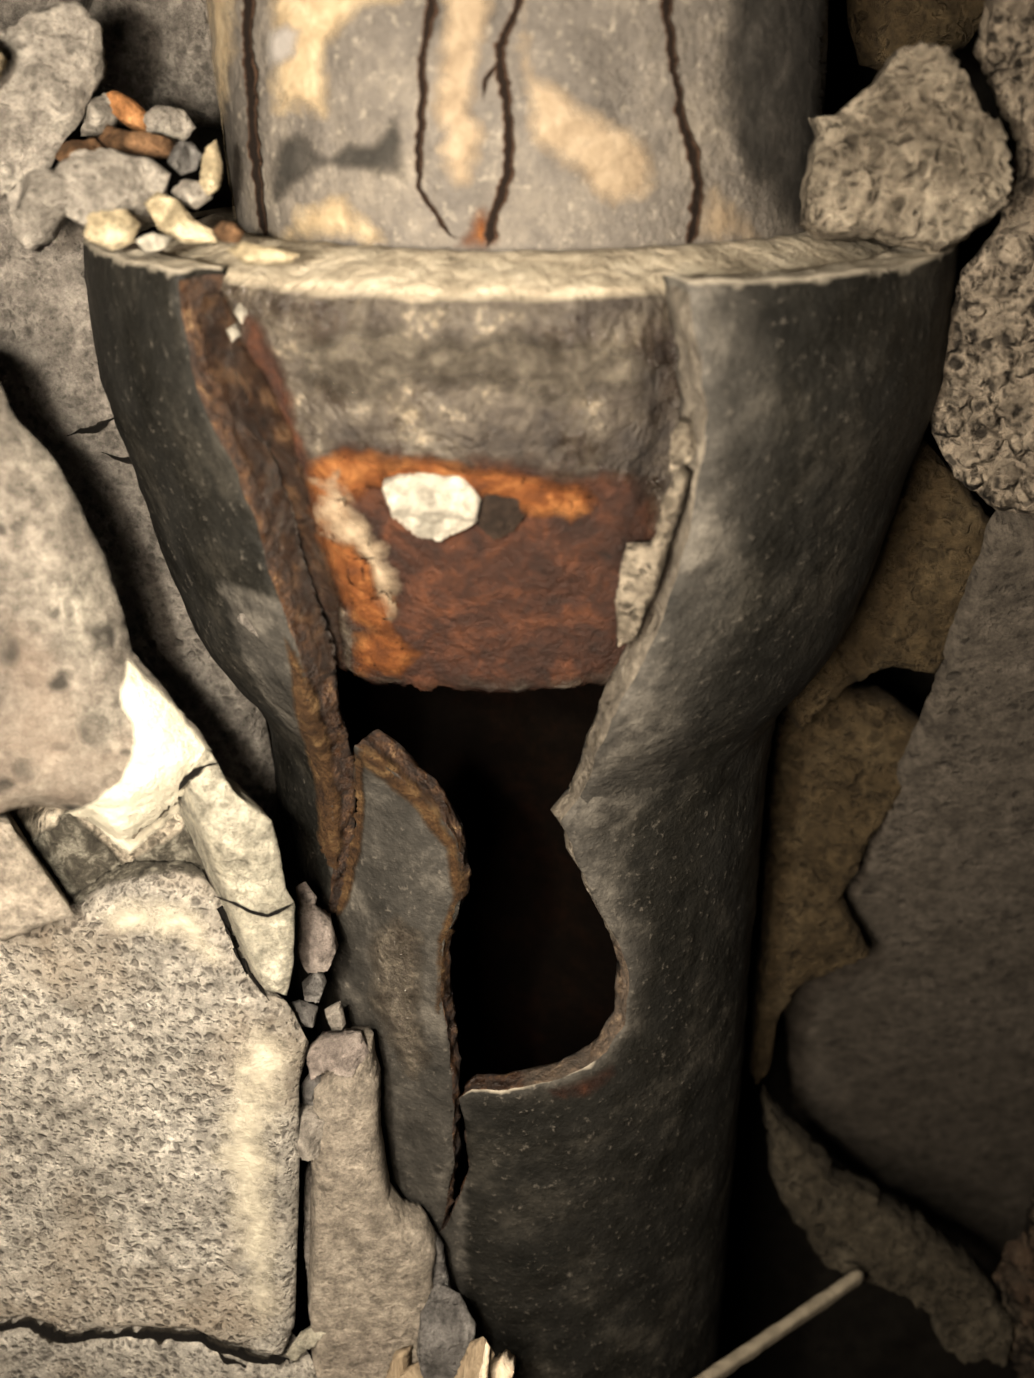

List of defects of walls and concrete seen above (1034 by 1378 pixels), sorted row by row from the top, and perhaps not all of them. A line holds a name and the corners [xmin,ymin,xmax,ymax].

crack [241,0,267,236]
crack [414,0,523,248]
crack [659,0,703,244]
corrosion [198,291,654,1014]
crack [0,1317,290,1368]